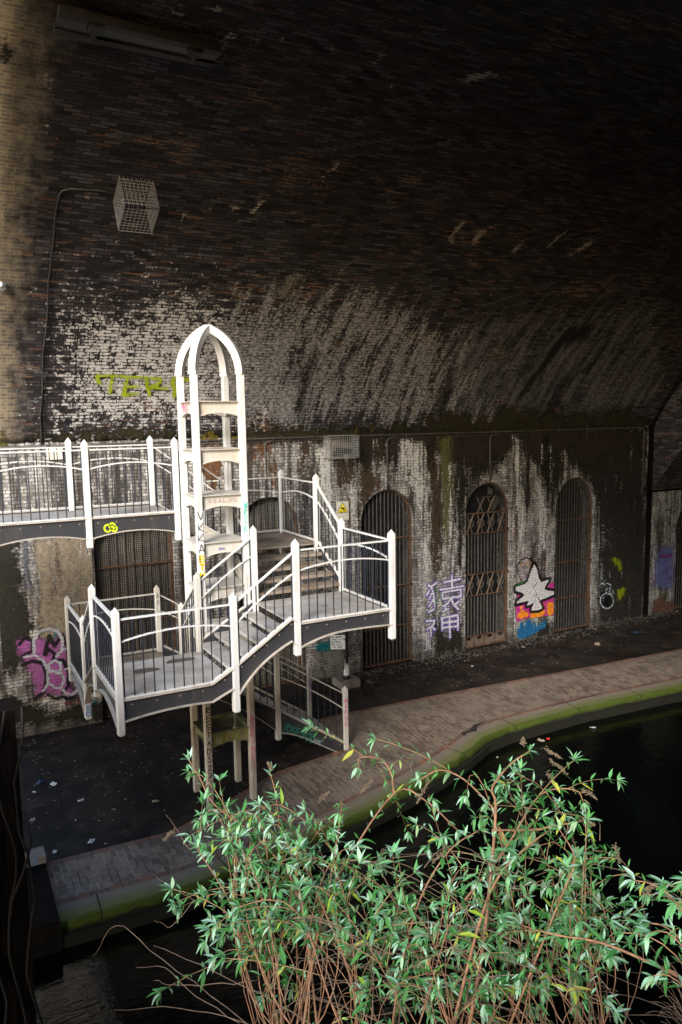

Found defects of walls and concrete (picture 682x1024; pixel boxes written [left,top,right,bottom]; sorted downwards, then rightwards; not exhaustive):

damp [231,321,650,656]
damp [0,538,67,678]
damp [5,692,103,730]